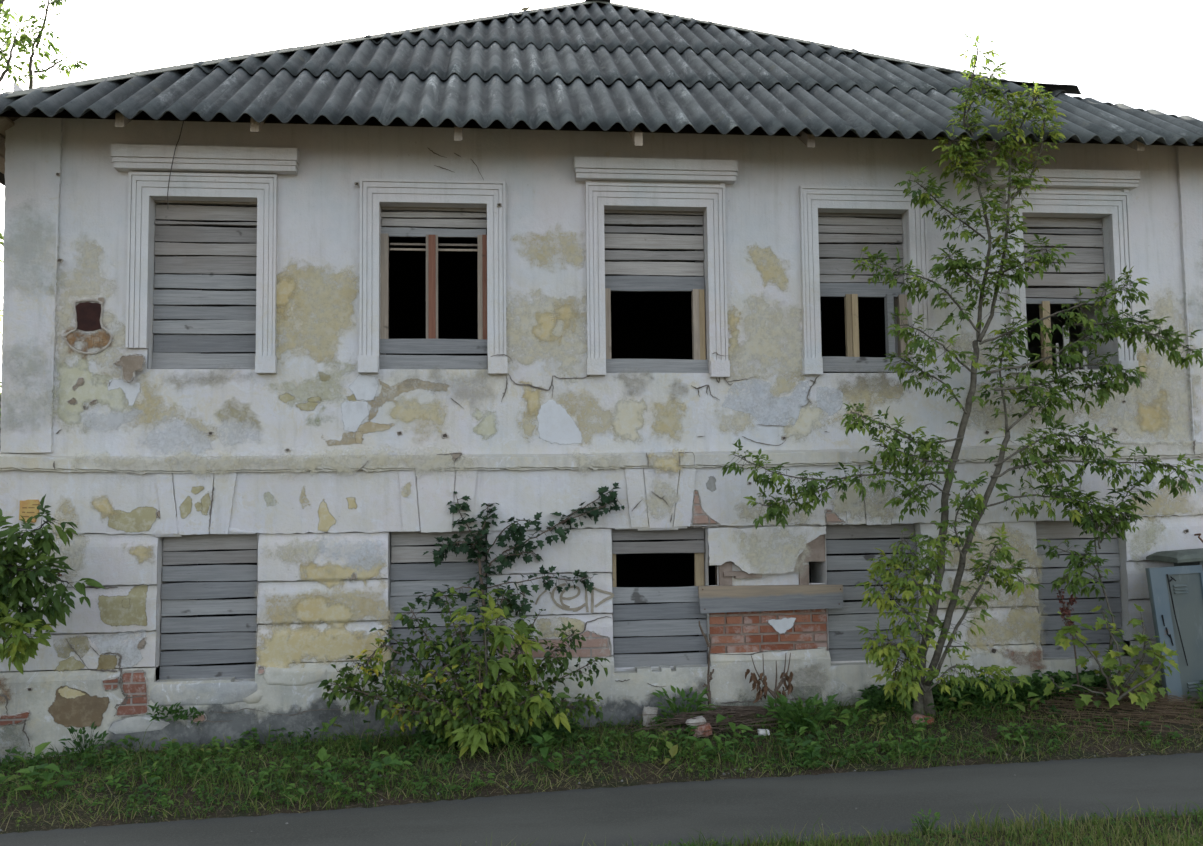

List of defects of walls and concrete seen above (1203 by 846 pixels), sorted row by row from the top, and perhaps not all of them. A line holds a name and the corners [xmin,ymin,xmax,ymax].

peeling [53,353,214,437]
peeling [271,264,462,461]
peeling [518,381,616,472]
peeling [47,502,86,582]
peeling [92,496,161,563]
peeling [180,486,211,518]
peeling [257,486,391,674]
spalling [687,476,721,529]
spalling [715,562,762,586]
peeling [793,480,897,585]
peeling [48,584,150,728]
flaking render [709,609,827,653]